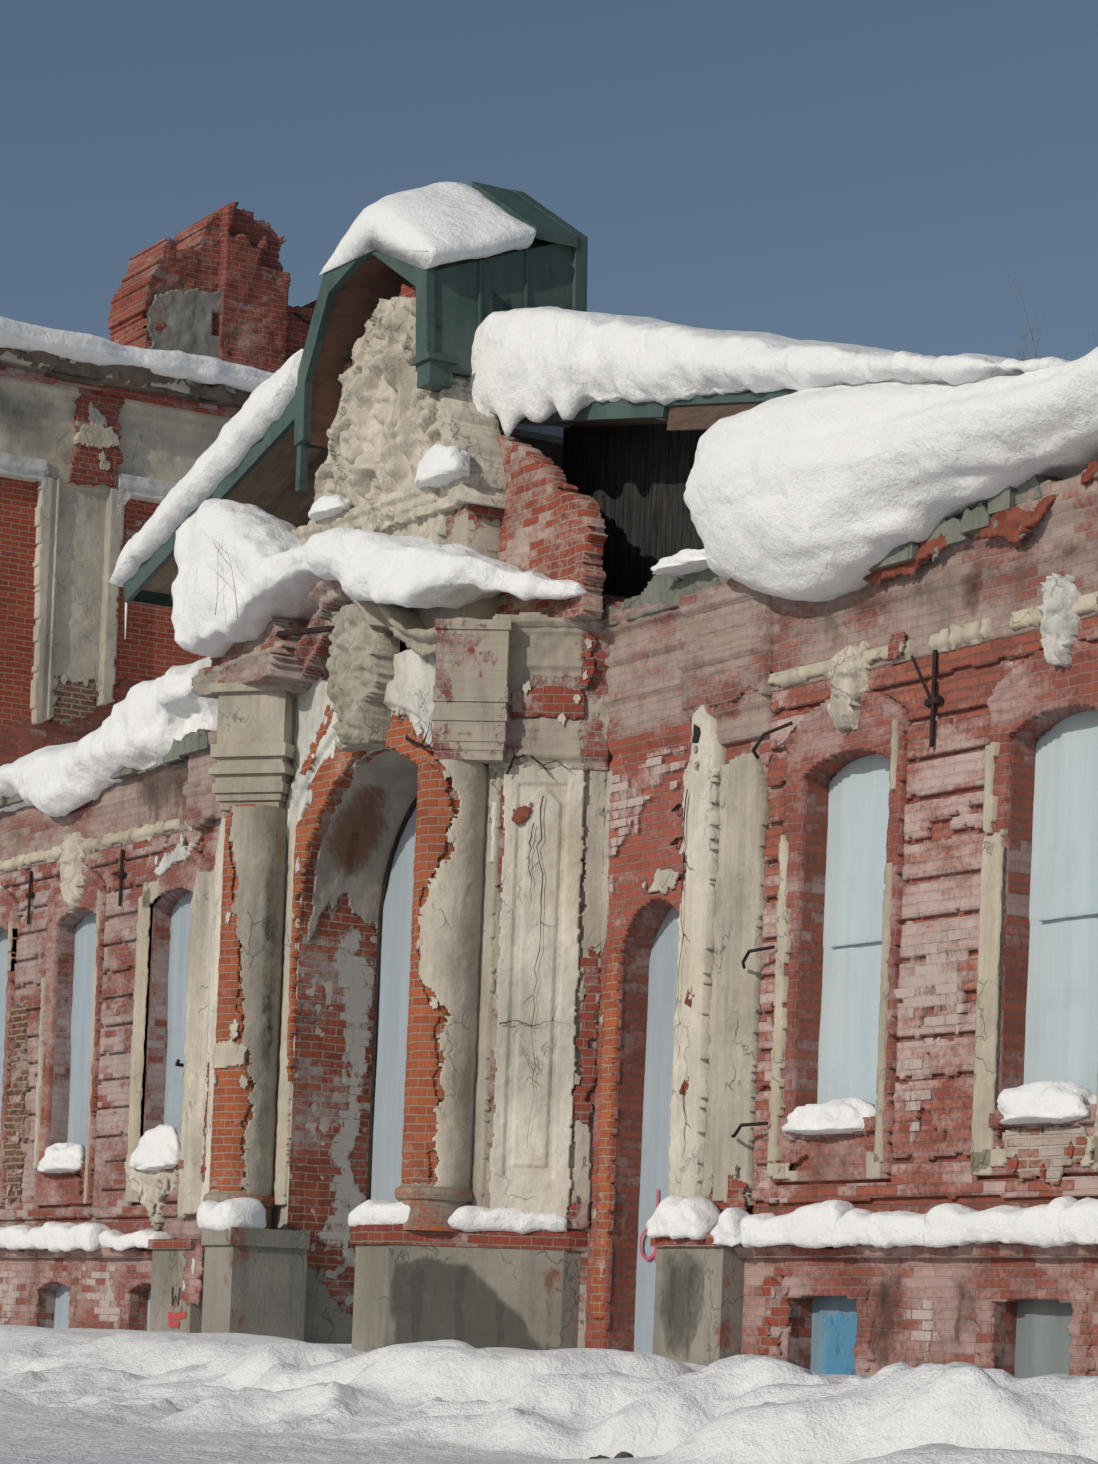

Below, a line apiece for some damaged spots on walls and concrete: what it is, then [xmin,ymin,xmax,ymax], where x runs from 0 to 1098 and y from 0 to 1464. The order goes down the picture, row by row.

peeling [68,388,125,488]
spalling [863,532,950,585]
spalling [975,494,1059,544]
peeling [509,634,598,726]
rust [330,788,382,870]
peeling [286,705,366,1082]
peeling [385,706,455,1184]
crack [499,748,572,1144]
peeling [201,815,253,1191]
peeling [319,927,376,1256]
leakage [391,1259,538,1350]
leakage [663,1258,699,1352]